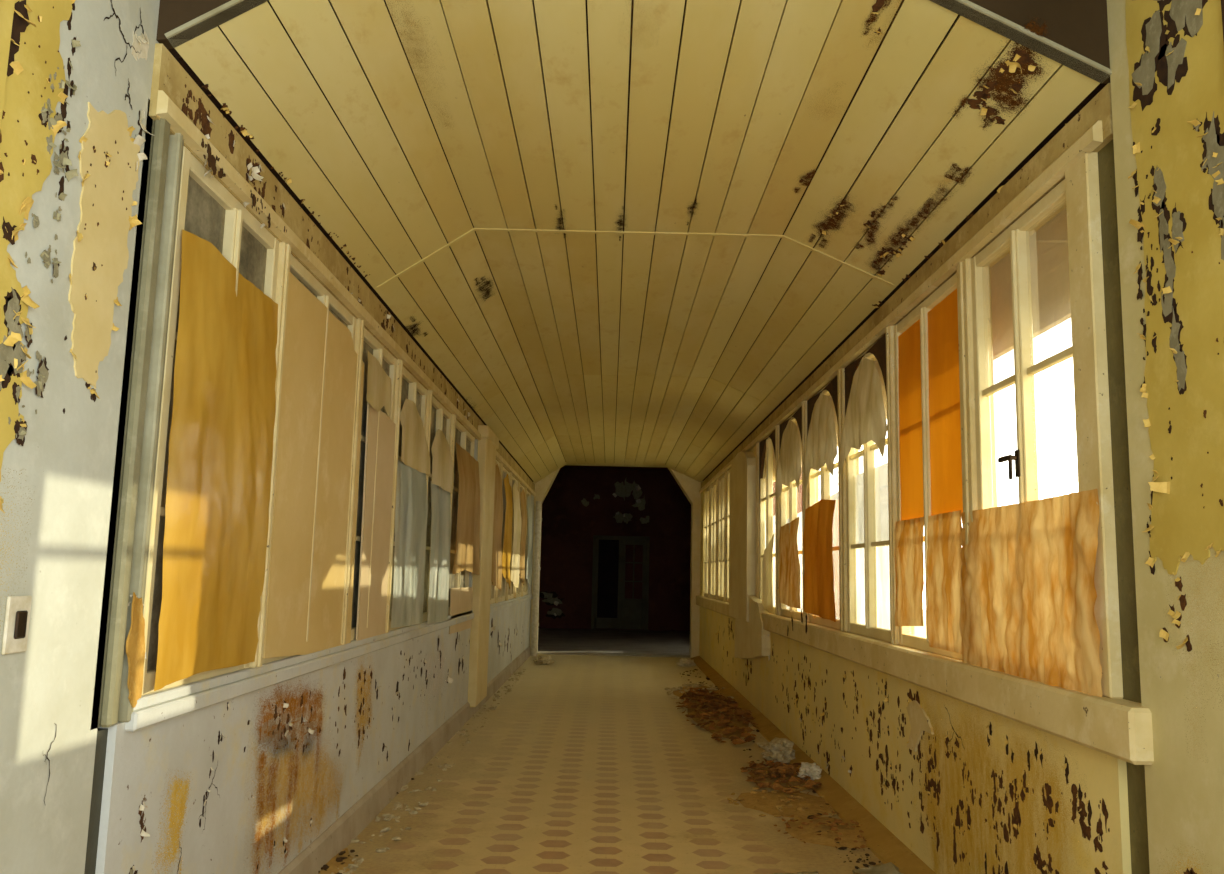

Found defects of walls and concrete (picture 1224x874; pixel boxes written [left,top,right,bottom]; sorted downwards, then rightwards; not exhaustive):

peeling [871,0,885,35]
peeling [968,49,1038,125]
peeling [181,84,292,232]
peeling [300,199,370,308]
peeling [873,232,915,276]
peeling [381,309,395,336]
peeling [1125,0,1224,652]
corrosion [250,674,328,874]
peeling [772,608,1110,874]